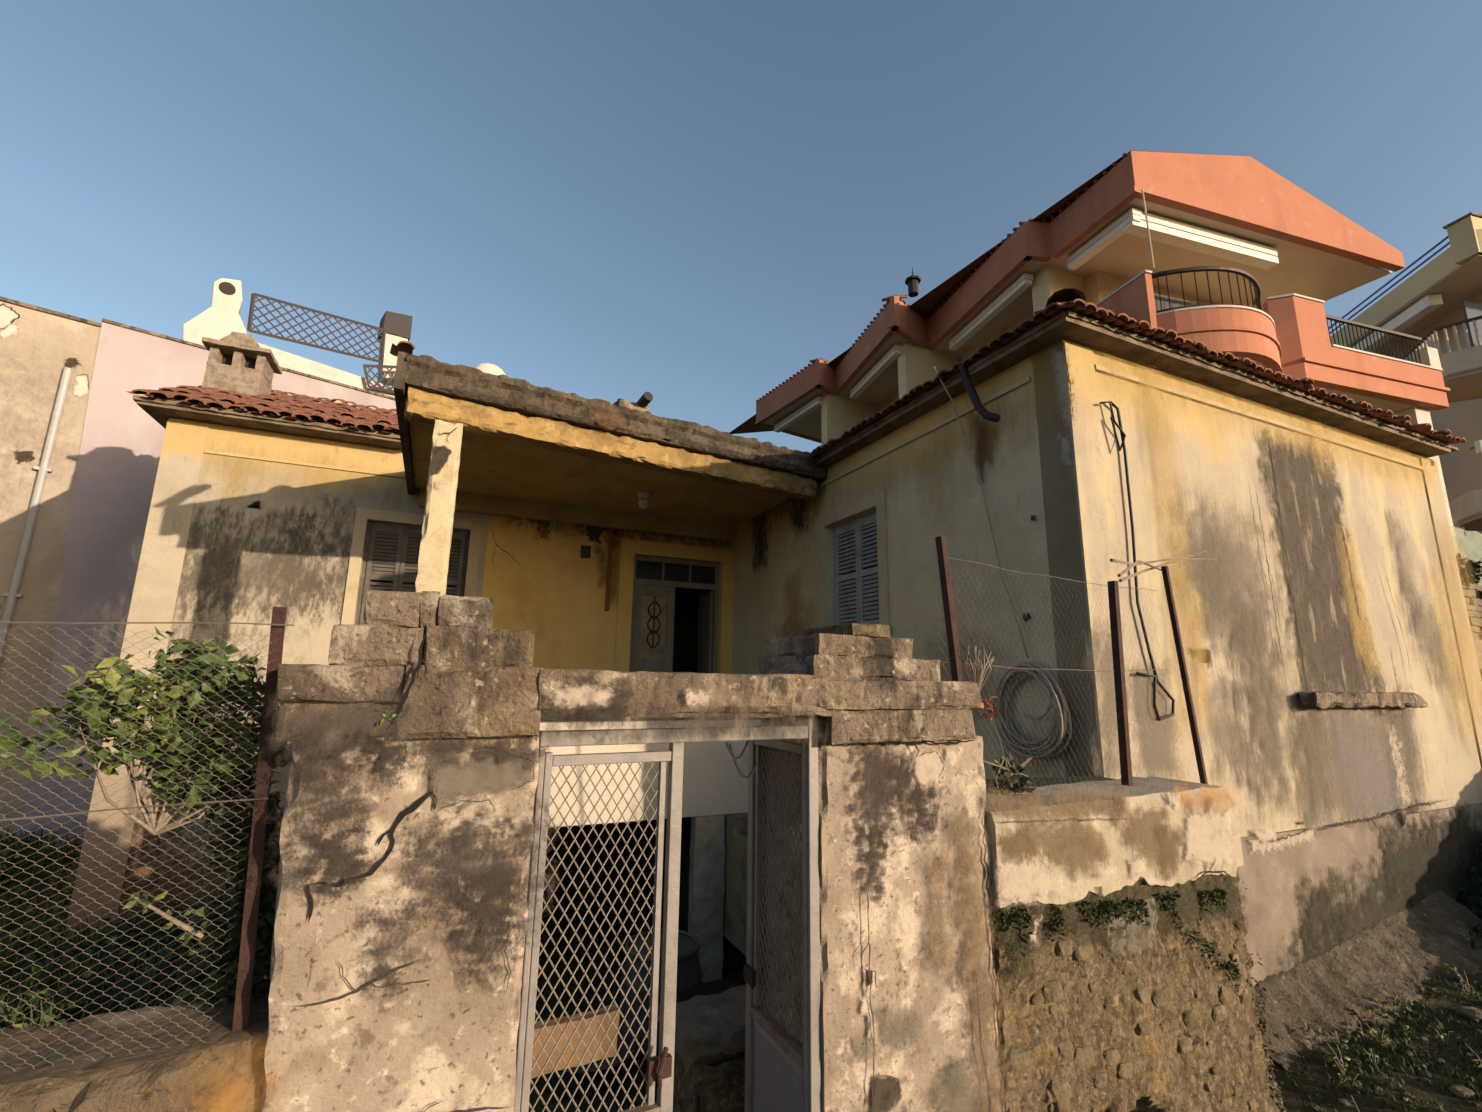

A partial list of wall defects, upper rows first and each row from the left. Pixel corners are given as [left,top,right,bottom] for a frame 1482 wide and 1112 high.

peeling [0,303,20,339]
water stain [178,500,352,618]
water stain [750,483,825,570]
water stain [1174,429,1482,974]
crack [306,757,437,923]
water stain [846,634,1184,1112]
peeling [998,860,1061,948]
spalling [1103,898,1158,956]
peeling [1130,858,1147,879]
peeling [1168,793,1315,871]
crack [423,1101,511,1112]
spalling [1130,1102,1166,1112]